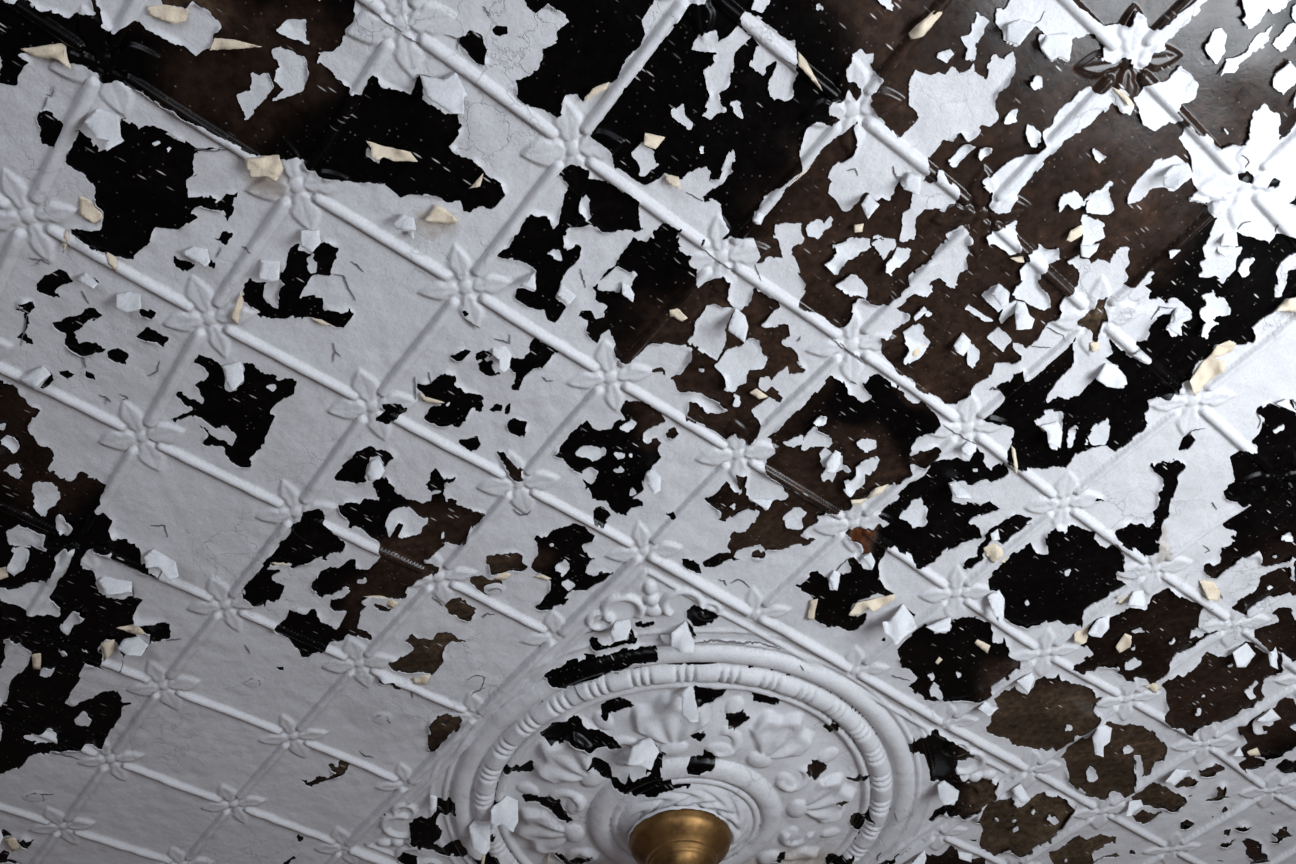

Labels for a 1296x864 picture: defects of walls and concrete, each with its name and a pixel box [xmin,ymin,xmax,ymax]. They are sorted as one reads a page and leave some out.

peeling [0,0,508,271]
peeling [15,269,99,344]
peeling [231,230,354,328]
peeling [171,355,297,467]
peeling [376,403,407,424]
peeling [417,338,558,451]
peeling [470,0,1296,864]
peeling [0,292,179,774]
peeling [241,446,485,658]
peeling [379,632,466,689]
peeling [428,713,462,752]
peeling [397,793,573,864]